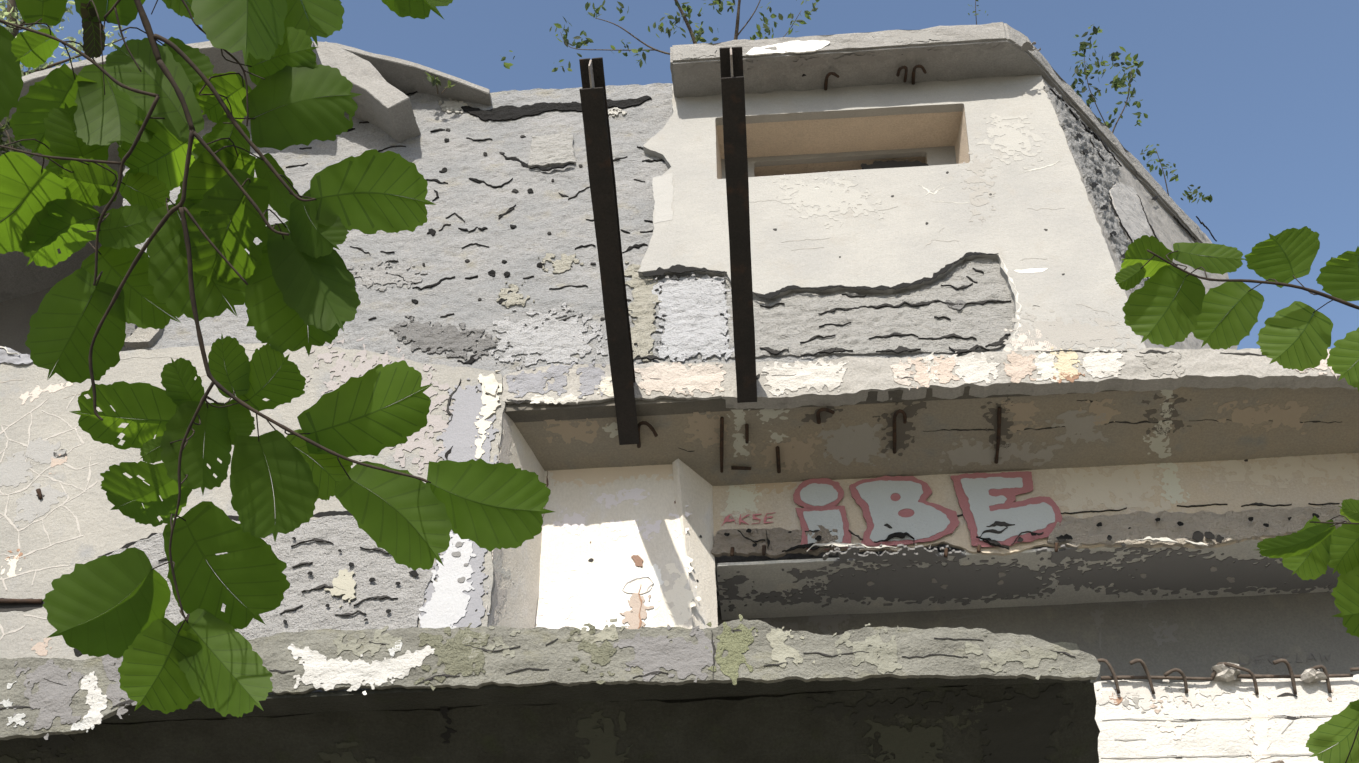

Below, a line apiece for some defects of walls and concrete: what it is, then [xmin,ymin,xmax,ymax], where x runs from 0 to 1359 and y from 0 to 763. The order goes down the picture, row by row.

peeling [520,133,583,182]
spalling [652,173,674,223]
spalling [1044,85,1158,269]
spalling [0,346,33,366]
spalling [624,261,663,362]
spalling [726,278,735,359]
spalling [753,255,1022,359]
corrosion [750,432,823,473]
crack [0,379,167,641]
crack [279,511,398,645]